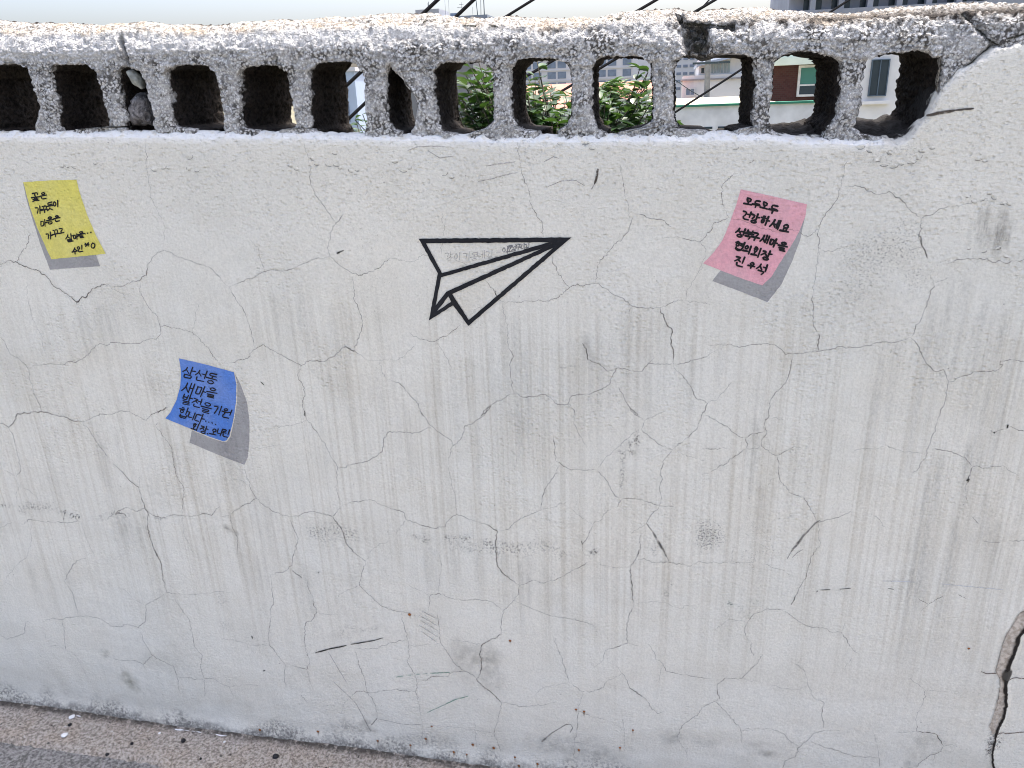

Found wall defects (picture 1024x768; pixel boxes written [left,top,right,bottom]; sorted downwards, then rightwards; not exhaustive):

crack [10,235,193,344]
crack [190,254,388,433]
crack [477,175,1022,515]
crack [2,344,590,747]
crack [981,629,1024,768]
flaking render [988,611,1024,754]